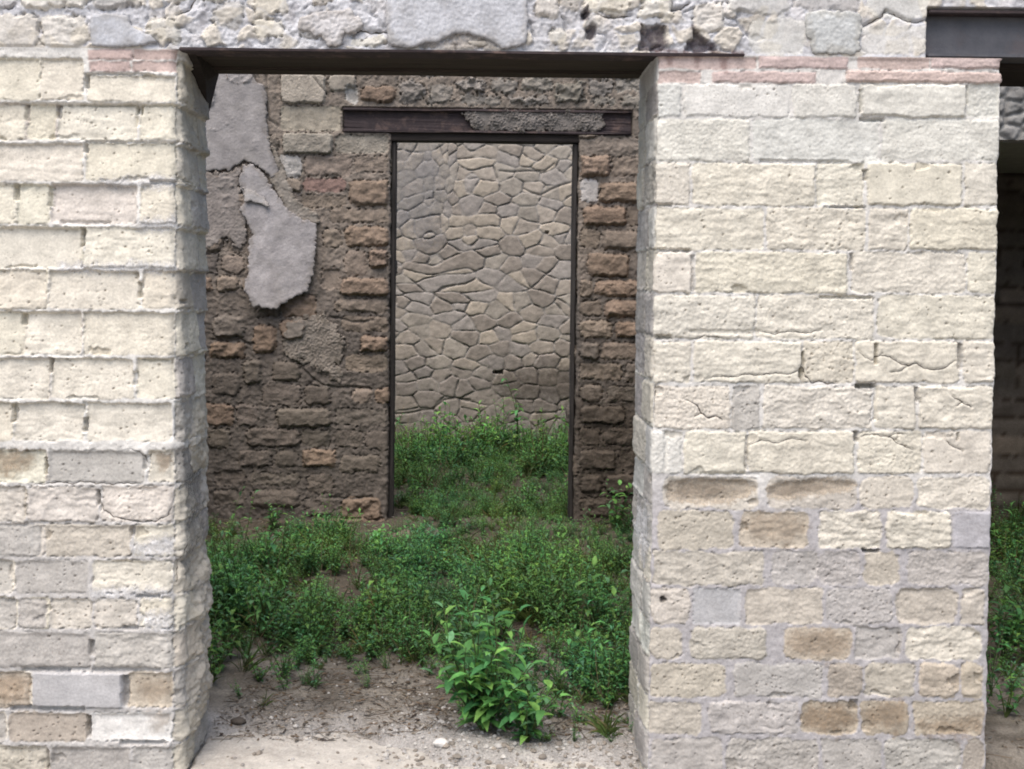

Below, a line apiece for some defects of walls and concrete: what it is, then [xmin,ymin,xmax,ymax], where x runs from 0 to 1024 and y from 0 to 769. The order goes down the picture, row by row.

peeling [205,74,320,309]
crack [863,355,954,372]
crack [685,399,722,419]
crack [38,449,173,522]